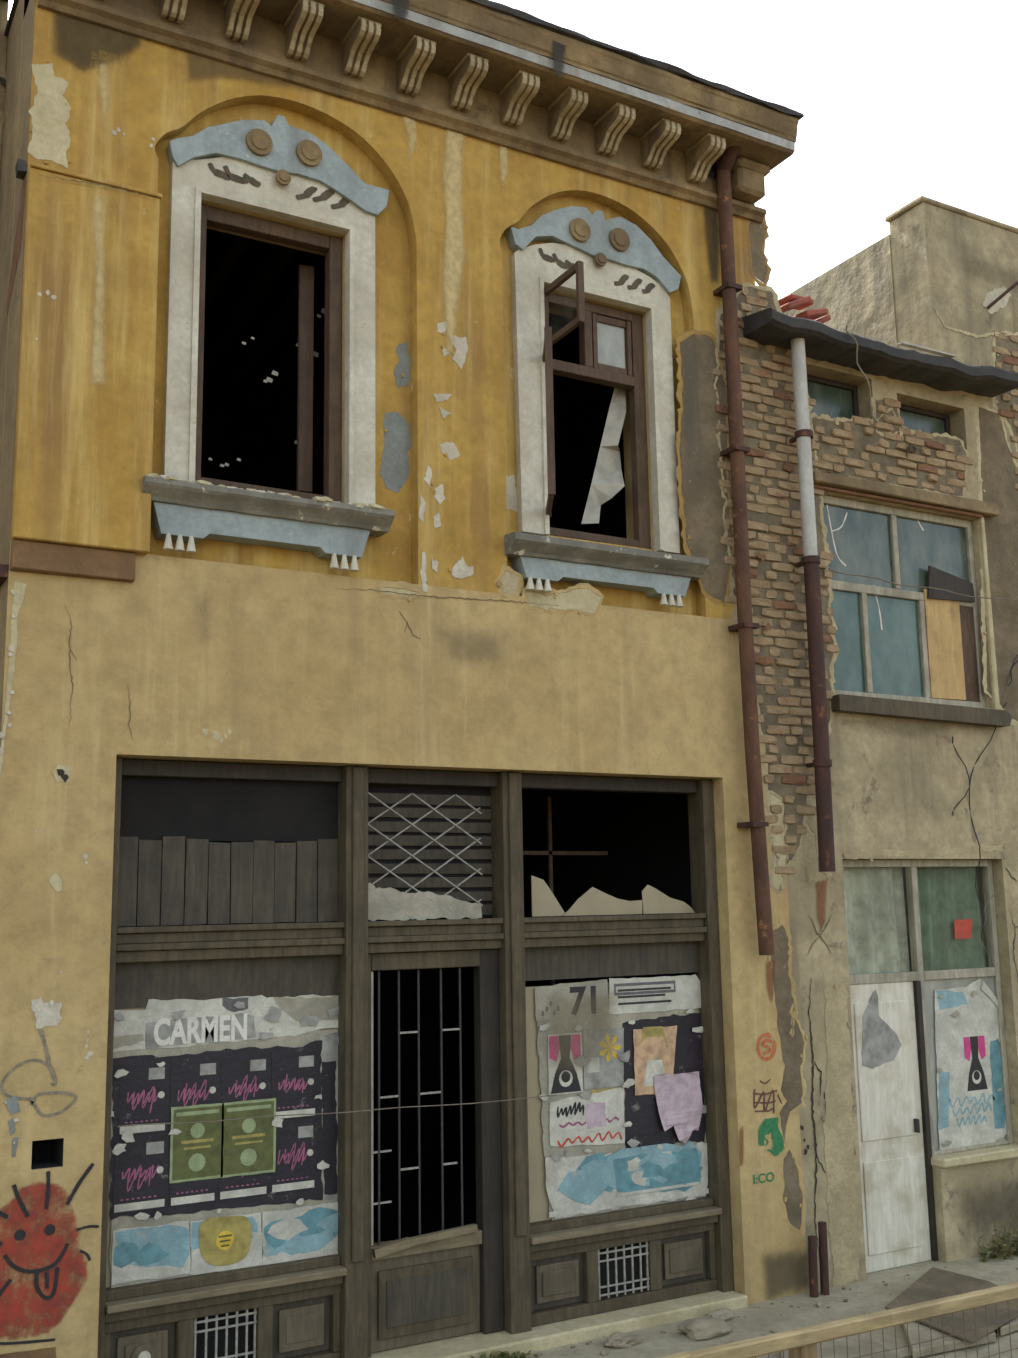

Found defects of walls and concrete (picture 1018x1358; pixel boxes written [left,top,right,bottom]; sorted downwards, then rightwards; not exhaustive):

peeling [28,60,71,168]
peeling [394,340,410,389]
peeling [437,321,468,369]
peeling [433,393,452,419]
peeling [380,411,445,528]
peeling [439,442,461,460]
flaking render [374,552,474,601]
flaking render [494,565,604,619]
flaking render [675,217,1018,893]
flaking render [0,581,27,780]
crack [65,604,77,724]